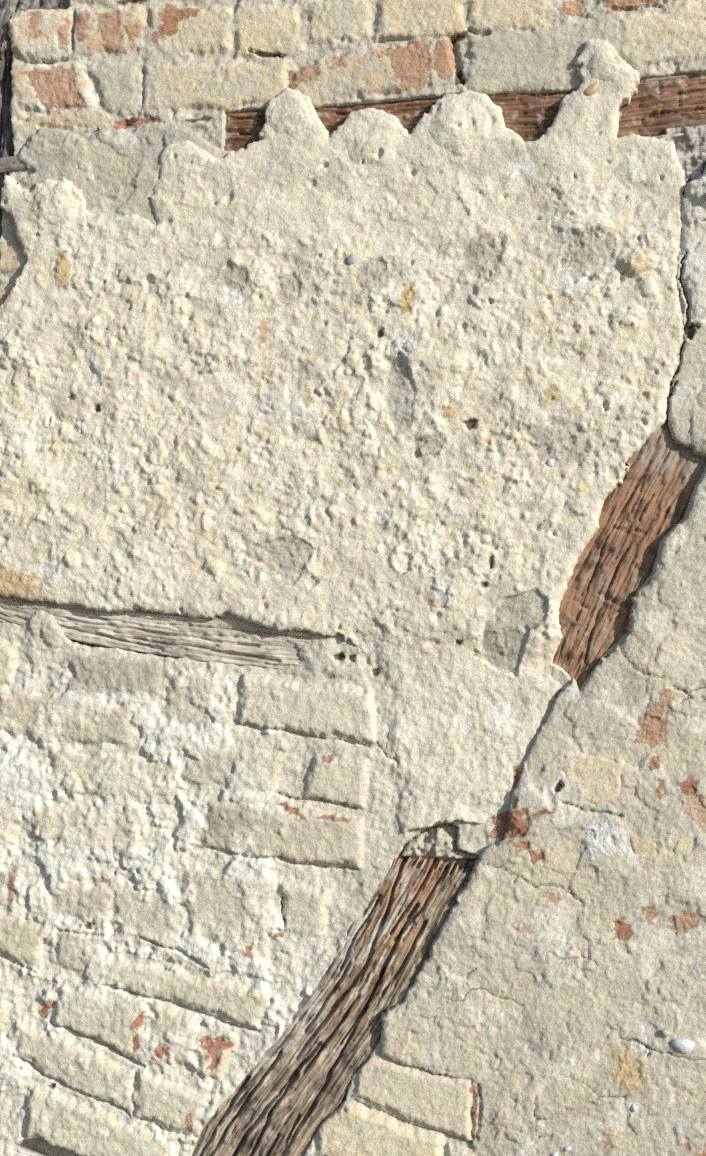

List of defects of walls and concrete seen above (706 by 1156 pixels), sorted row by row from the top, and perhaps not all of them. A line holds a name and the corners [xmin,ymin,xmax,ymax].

peeling [558,0,585,17]
peeling [604,0,657,13]
peeling [58,9,146,55]
peeling [288,51,350,88]
peeling [372,35,465,94]
peeling [25,63,86,127]
peeling [115,115,159,130]
crack [667,248,697,421]
spalling [530,417,592,463]
crack [619,641,706,702]
crack [490,865,579,900]
crack [622,1038,697,1060]